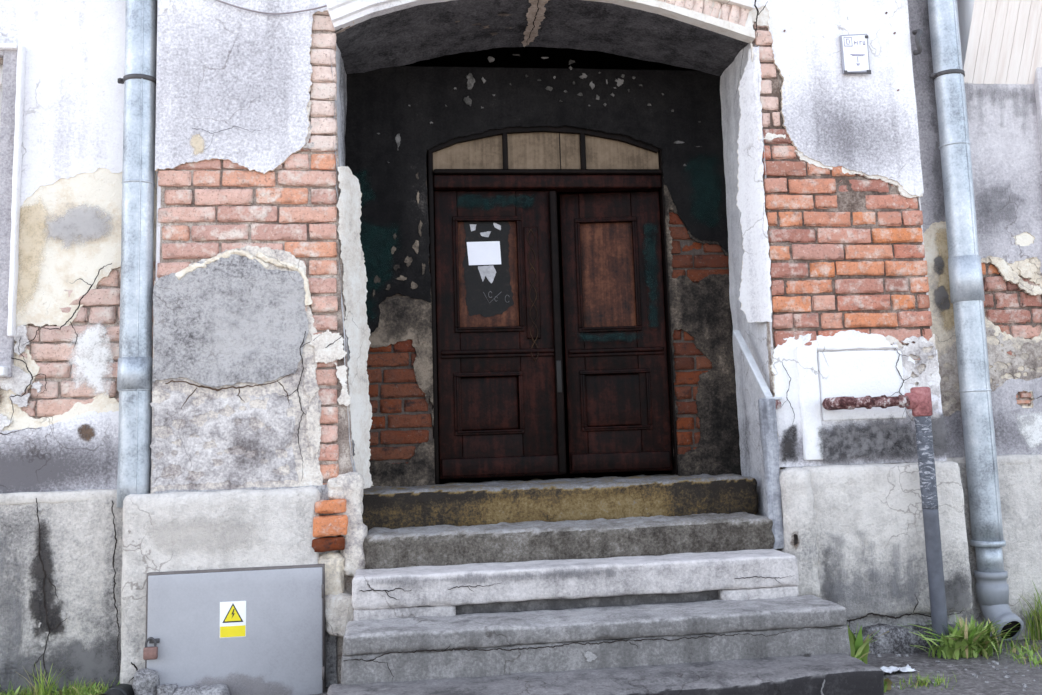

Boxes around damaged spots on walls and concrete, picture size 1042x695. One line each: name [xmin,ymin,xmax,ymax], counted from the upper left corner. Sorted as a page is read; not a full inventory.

peeling [454,73,486,109]
peeling [525,60,642,106]
flaking render [0,168,122,431]
flaking render [150,11,352,494]
crack [165,331,344,480]
flaking render [367,220,435,487]
flaking render [663,177,742,476]
flaking render [750,6,961,419]
leakage [818,417,917,464]
leakage [931,414,951,457]
flaking render [981,232,1042,409]
crack [32,498,67,690]